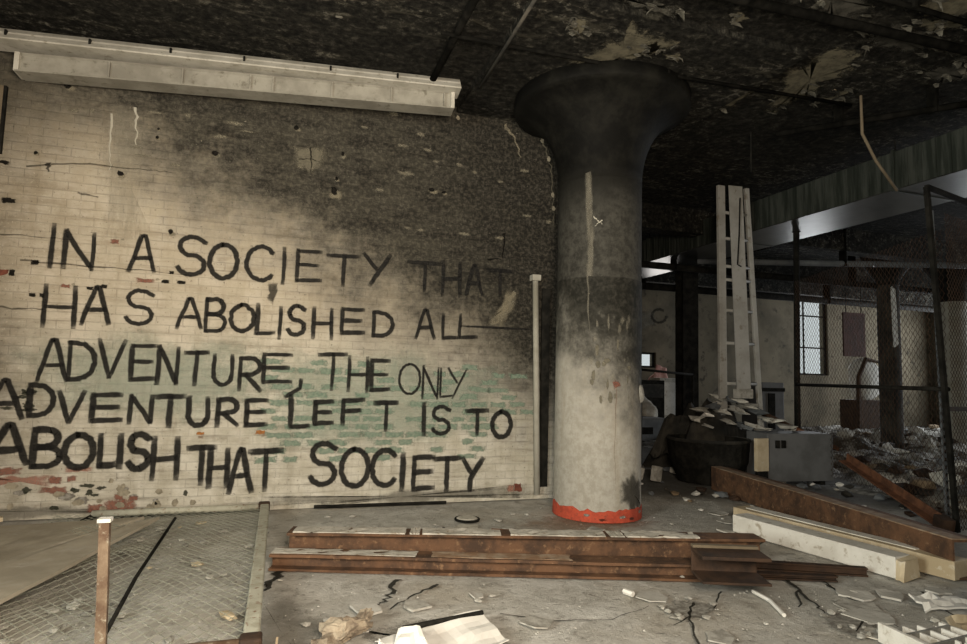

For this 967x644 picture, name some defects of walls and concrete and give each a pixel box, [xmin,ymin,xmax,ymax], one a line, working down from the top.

peeling [565,17,592,37]
peeling [572,21,683,64]
peeling [626,0,685,20]
peeling [718,0,967,114]
peeling [0,467,196,512]